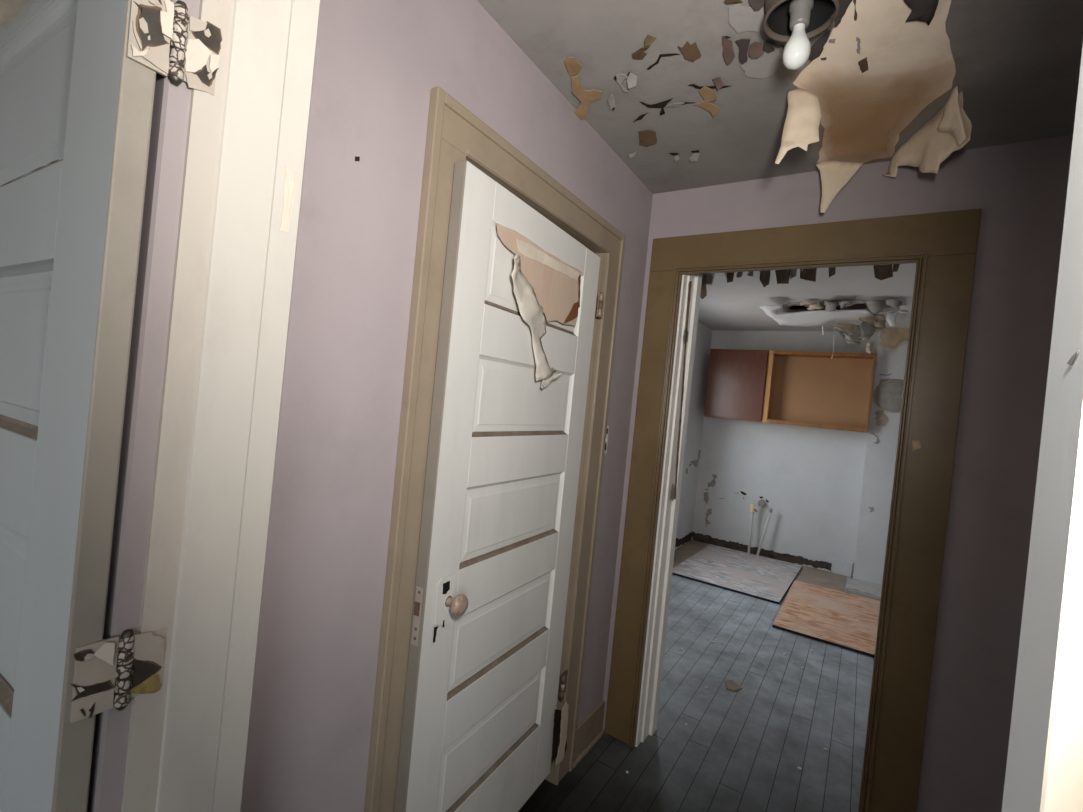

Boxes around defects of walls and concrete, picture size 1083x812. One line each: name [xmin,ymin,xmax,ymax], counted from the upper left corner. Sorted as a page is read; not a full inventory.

peeling [632,35,701,70]
peeling [722,0,784,79]
peeling [808,0,852,61]
peeling [564,57,637,120]
peeling [629,77,729,159]
peeling [700,267,836,299]
peeling [873,264,900,280]
spalling [832,314,889,426]
crack [1067,350,1079,365]
peeling [703,474,717,527]